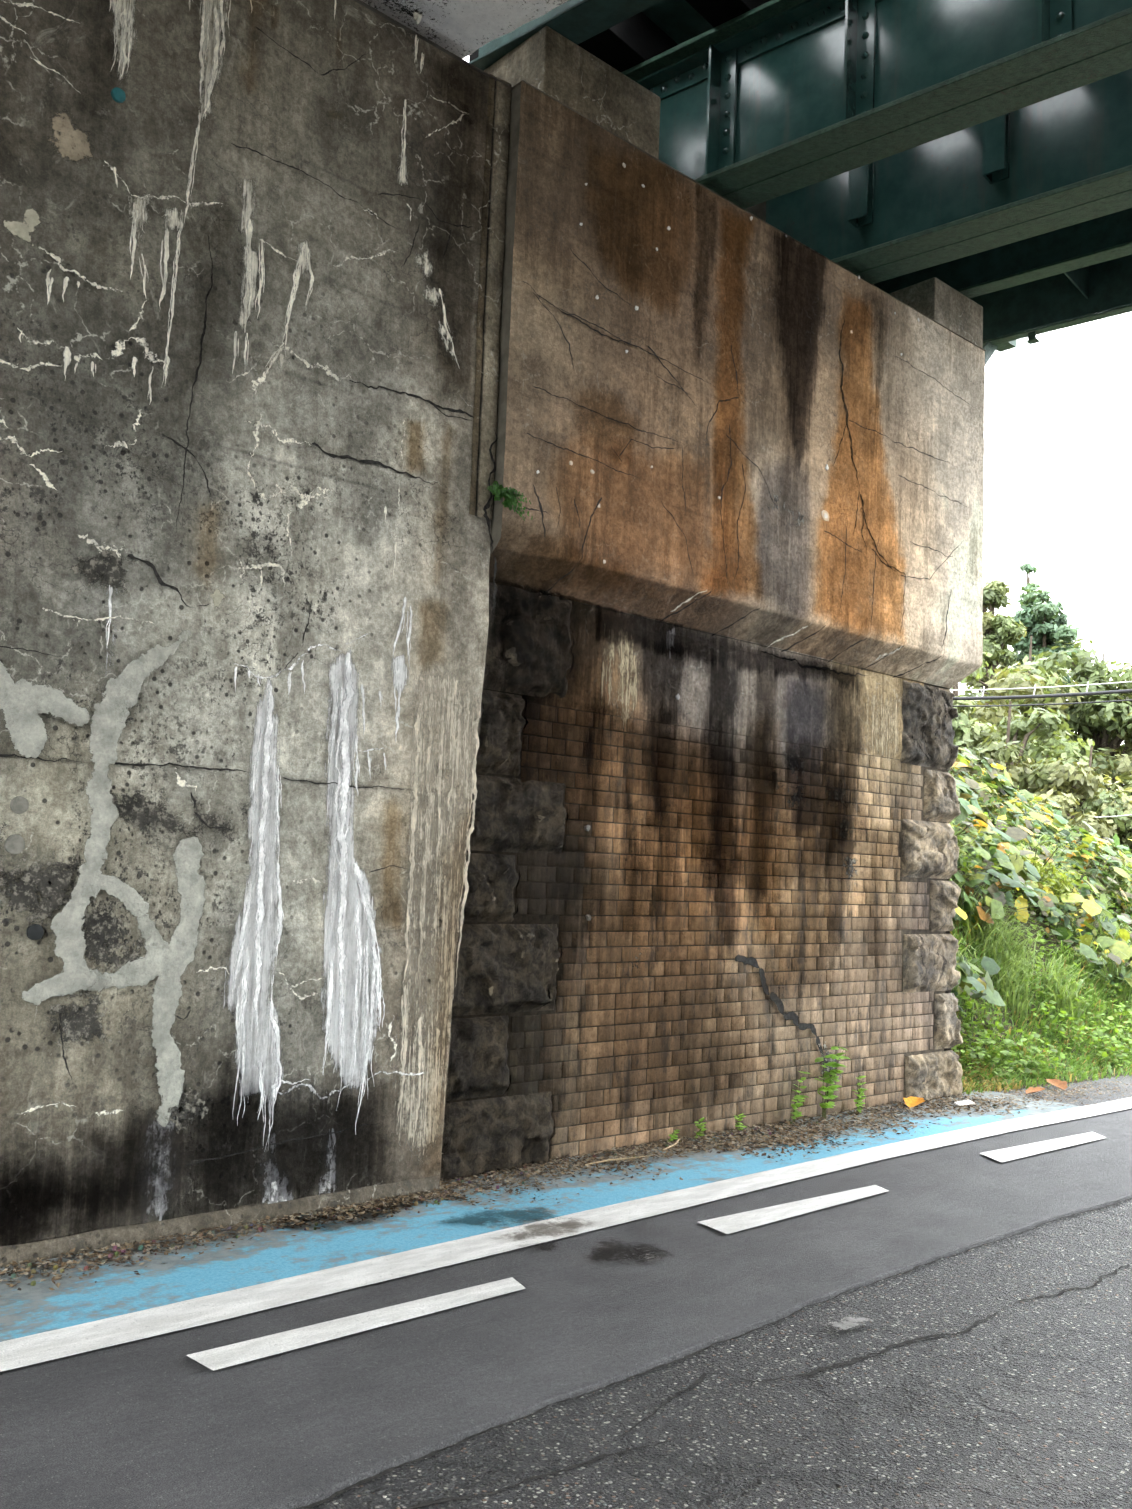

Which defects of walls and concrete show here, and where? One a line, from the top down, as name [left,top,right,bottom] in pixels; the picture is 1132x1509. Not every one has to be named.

efflorescence [109,0,137,80]
efflorescence [129,0,231,384]
crack [0,143,967,697]
water stain [774,233,826,467]
water stain [0,579,899,1247]
crack [735,954,823,1054]